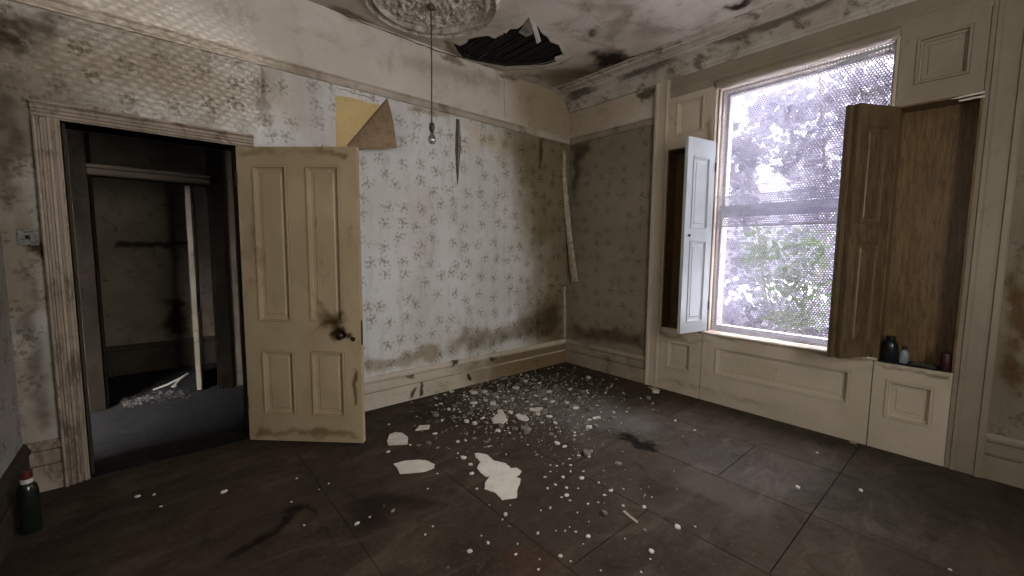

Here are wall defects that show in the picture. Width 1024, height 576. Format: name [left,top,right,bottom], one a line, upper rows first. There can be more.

mould [725,0,750,10]
peeling [519,18,567,54]
mould [637,88,654,99]
leakage [521,137,588,343]
peeling [562,150,578,338]